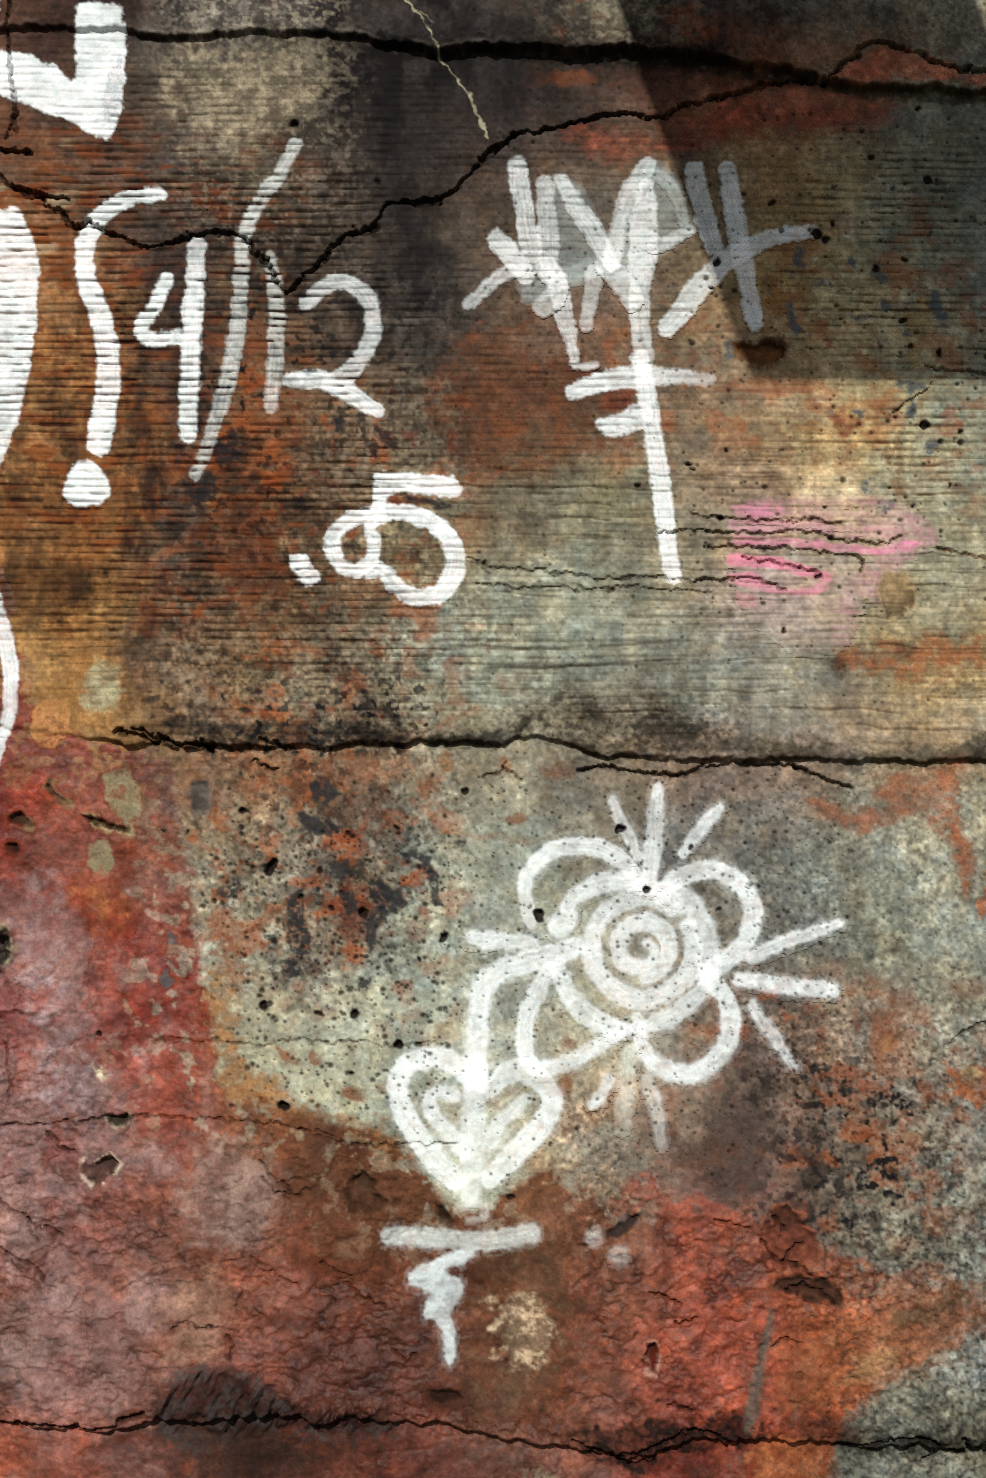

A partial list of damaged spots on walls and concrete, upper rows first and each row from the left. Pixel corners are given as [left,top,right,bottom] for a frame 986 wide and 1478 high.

leakage [136,0,561,347]
crack [0,0,986,295]
leakage [558,0,661,66]
corrosion [556,18,986,223]
leakage [814,73,986,110]
peeling [0,543,18,618]
spalling [874,566,921,624]
crack [112,727,217,758]
corrosion [214,743,459,862]
crack [576,758,854,790]
corrosion [189,911,396,1133]
peeling [0,639,961,1478]